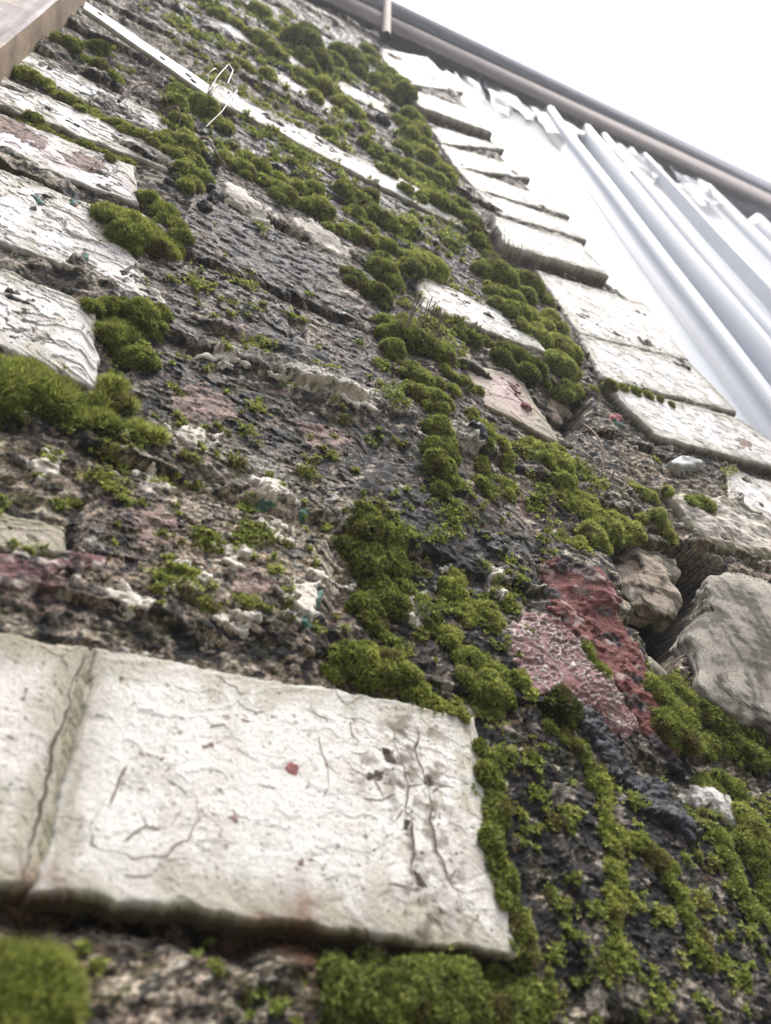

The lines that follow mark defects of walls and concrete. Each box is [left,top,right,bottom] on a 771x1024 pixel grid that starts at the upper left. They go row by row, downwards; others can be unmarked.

peeling [0,115,110,173]
peeling [17,192,109,261]
crack [201,683,276,789]
crack [89,775,222,878]
crack [271,678,466,942]